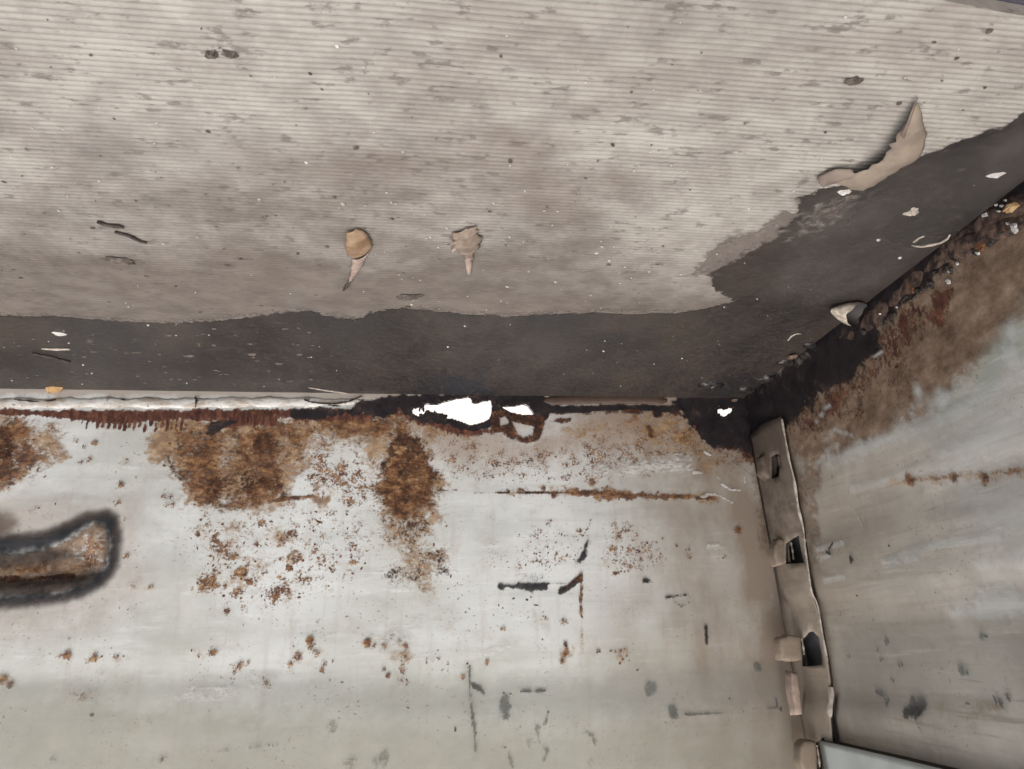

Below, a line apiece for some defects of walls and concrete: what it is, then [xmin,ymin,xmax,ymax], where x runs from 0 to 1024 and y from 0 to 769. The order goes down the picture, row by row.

damp [0,113,1024,398]
corrosion [843,194,1024,340]
corrosion [0,396,751,616]
peeling [408,395,539,427]
corrosion [891,468,1022,487]